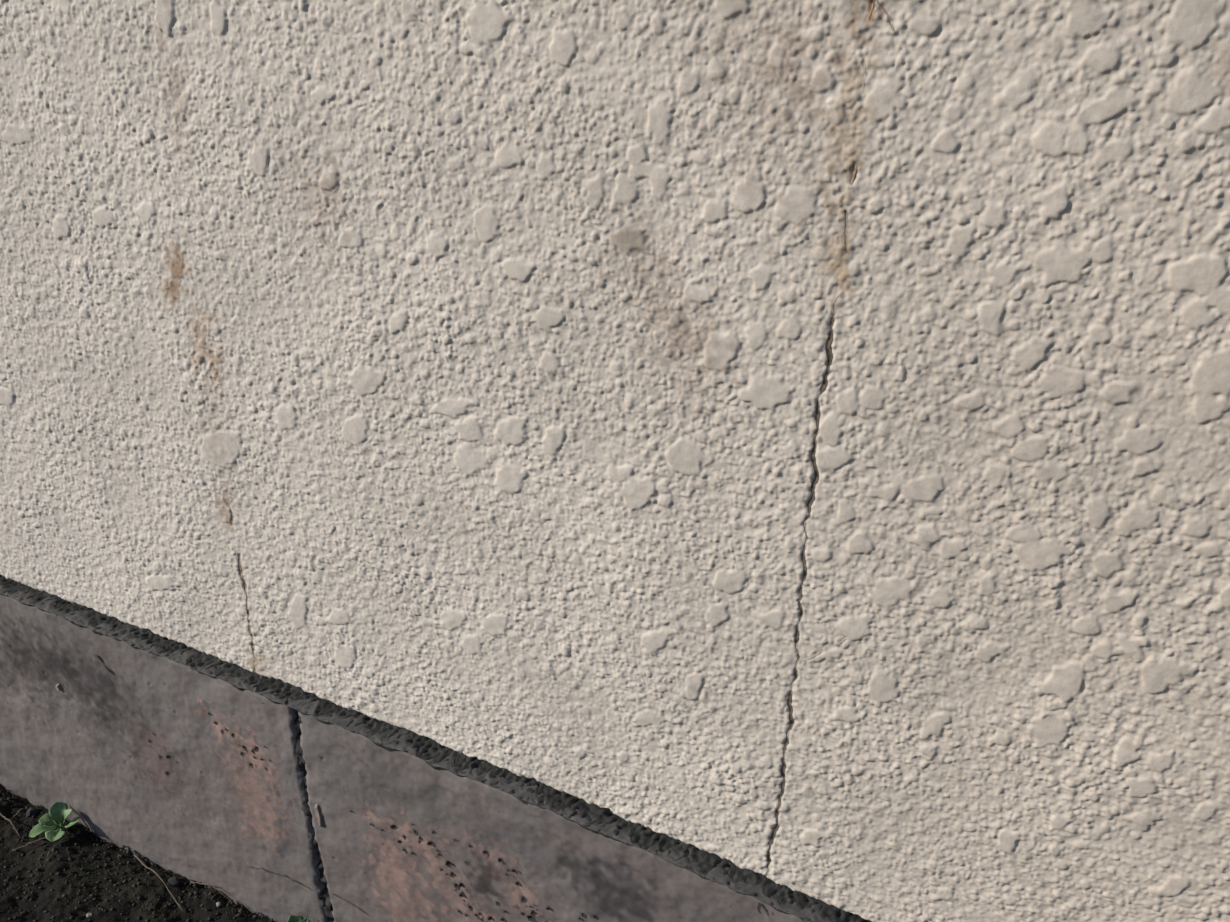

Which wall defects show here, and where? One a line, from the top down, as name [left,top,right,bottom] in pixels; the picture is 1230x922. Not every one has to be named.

crack [868,0,893,31]
crack [844,162,856,254]
crack [224,499,255,673]
crack [757,290,847,914]